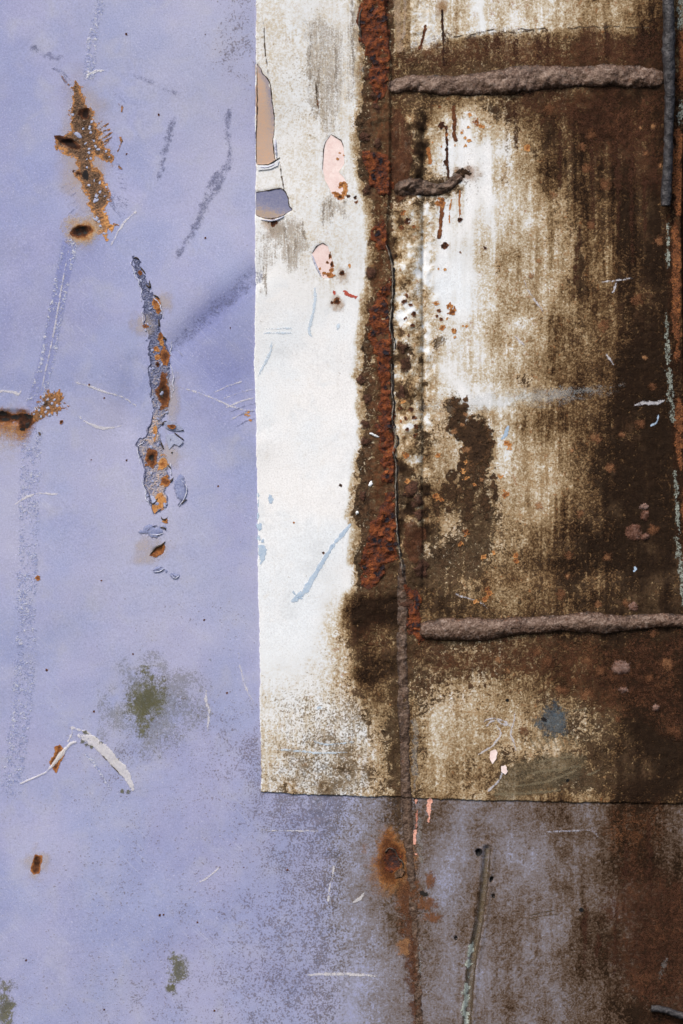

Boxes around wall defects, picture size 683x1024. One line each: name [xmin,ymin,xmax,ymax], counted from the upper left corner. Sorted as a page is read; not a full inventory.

corrosion [54,68,127,244]
peeling [255,28,292,222]
peeling [322,134,348,200]
corrosion [362,105,485,253]
peeling [312,243,336,278]
corrosion [0,407,45,440]
peeling [130,256,184,523]
corrosion [359,278,426,589]
peeling [149,542,165,557]
spalling [20,726,91,784]
corrosion [30,854,43,875]
corrosion [370,827,442,1024]